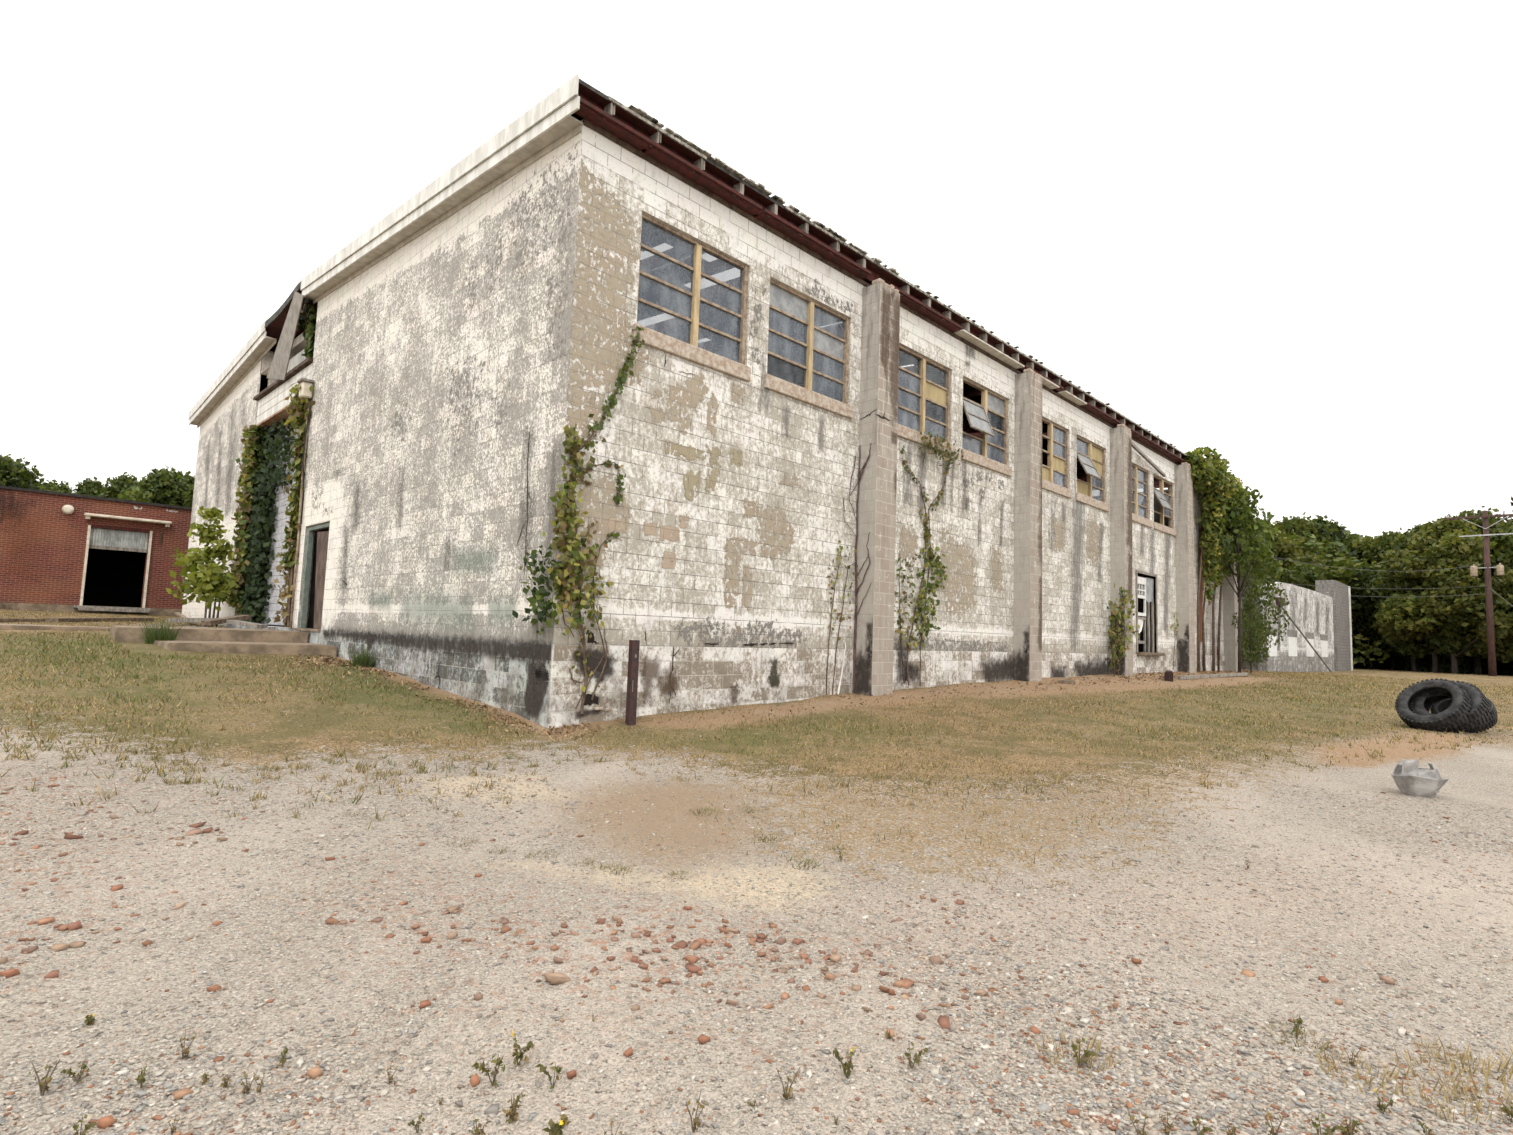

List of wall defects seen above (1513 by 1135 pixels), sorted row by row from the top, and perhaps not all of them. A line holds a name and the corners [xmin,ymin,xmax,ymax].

peeling [465,133,745,569]
peeling [670,498,807,648]